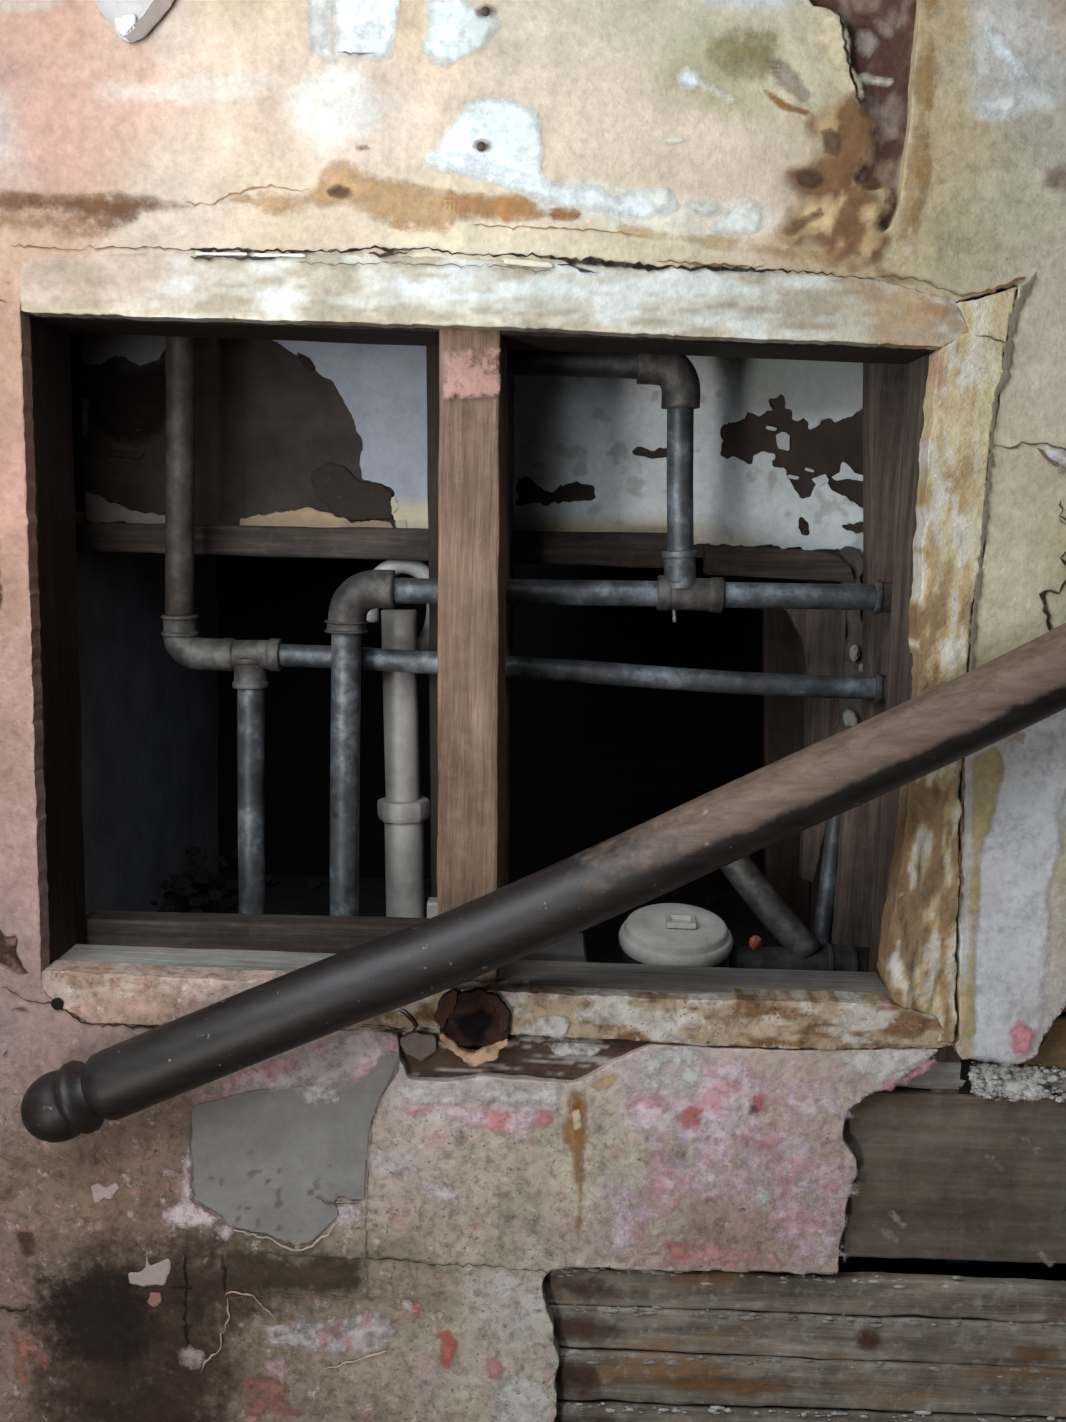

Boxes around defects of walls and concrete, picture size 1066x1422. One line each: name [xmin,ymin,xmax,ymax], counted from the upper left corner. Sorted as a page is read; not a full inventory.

peeling [424,0,497,64]
corrosion [444,194,662,237]
peeling [426,99,760,233]
spalling [768,0,917,262]
crack [10,244,1066,671]
crack [958,757,966,924]
peeling [958,709,1066,1095]
spalling [163,1015,935,1270]
corrosion [563,1076,616,1182]
leakage [18,1232,34,1255]
leakage [27,1237,359,1422]
crack [171,1217,550,1347]